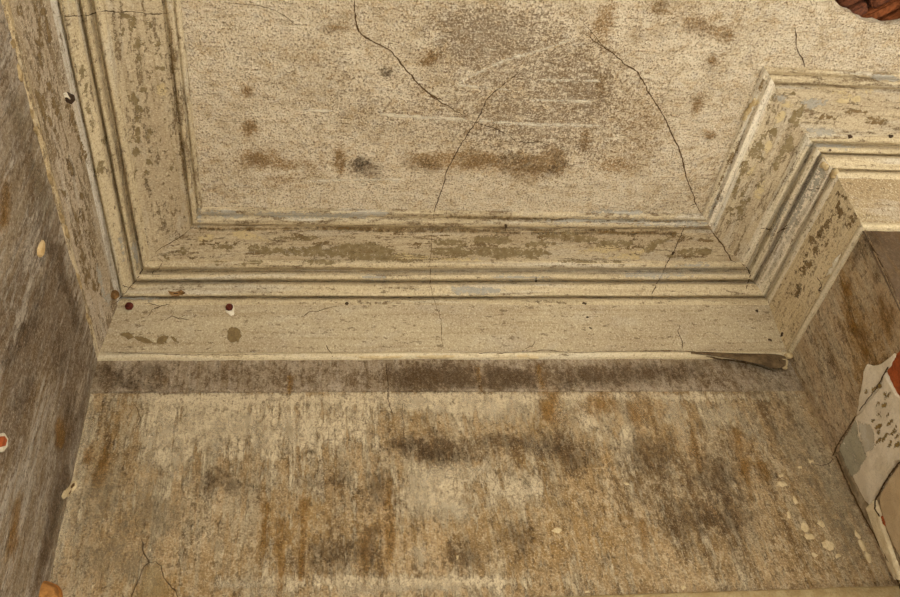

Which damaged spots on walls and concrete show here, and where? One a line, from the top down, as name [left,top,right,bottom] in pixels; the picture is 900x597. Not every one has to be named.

peeling [32,0,159,308]
peeling [115,11,187,194]
crack [354,0,547,344]
peeling [164,72,900,297]
crack [584,24,754,293]
crack [131,519,178,597]
spalling [832,351,900,589]